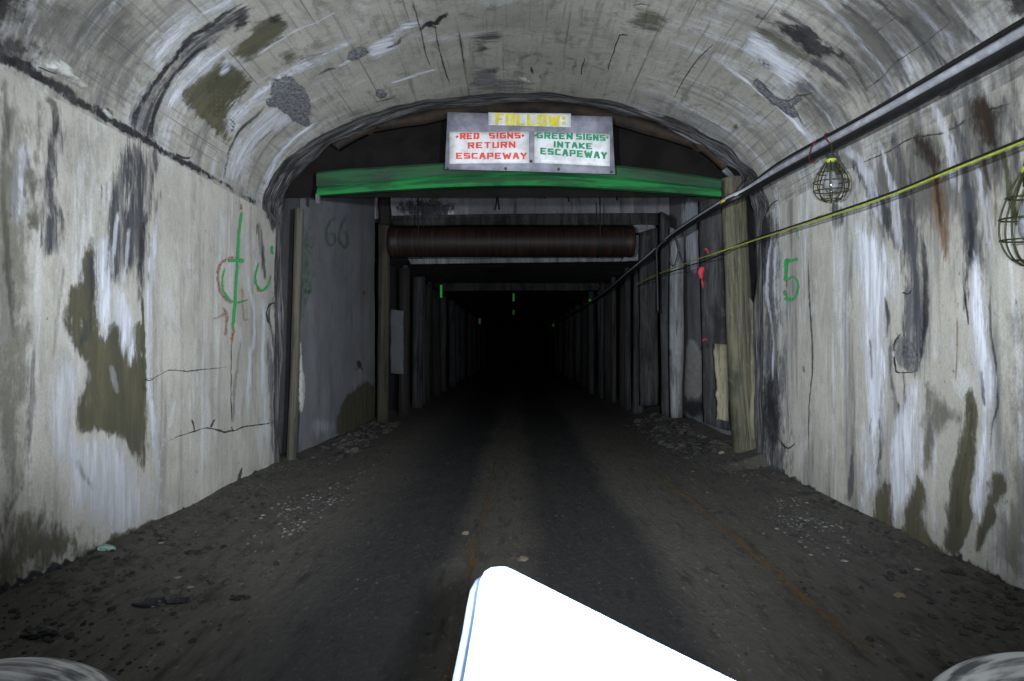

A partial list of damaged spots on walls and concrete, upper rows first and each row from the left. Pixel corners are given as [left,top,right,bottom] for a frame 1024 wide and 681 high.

damp [132,0,351,187]
spalling [266,75,311,126]
damp [726,65,810,137]
damp [746,14,847,129]
damp [11,143,30,222]
corrosion [914,134,947,258]
damp [53,215,157,544]
crack [145,347,269,438]
damp [848,151,1006,573]